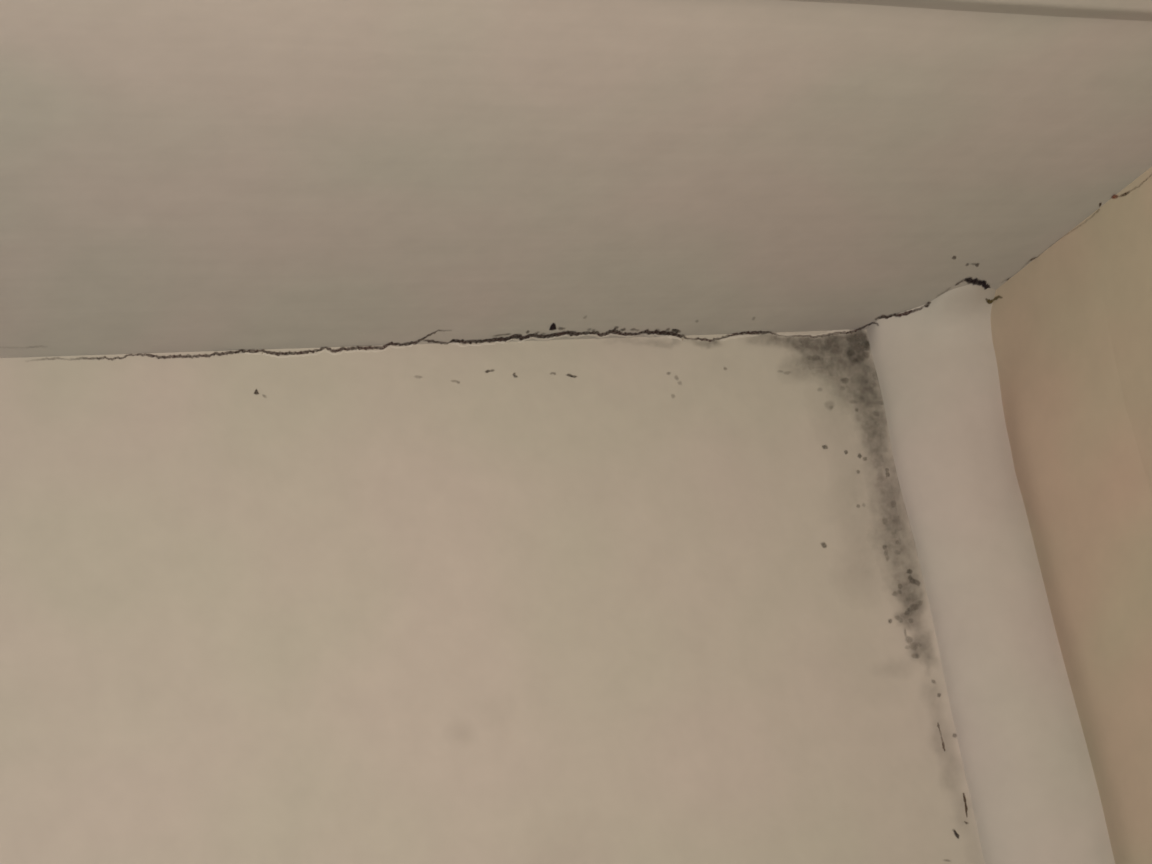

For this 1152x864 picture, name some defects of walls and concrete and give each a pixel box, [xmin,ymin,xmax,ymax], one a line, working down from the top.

crack [90,302,931,360]
water stain [788,330,870,362]